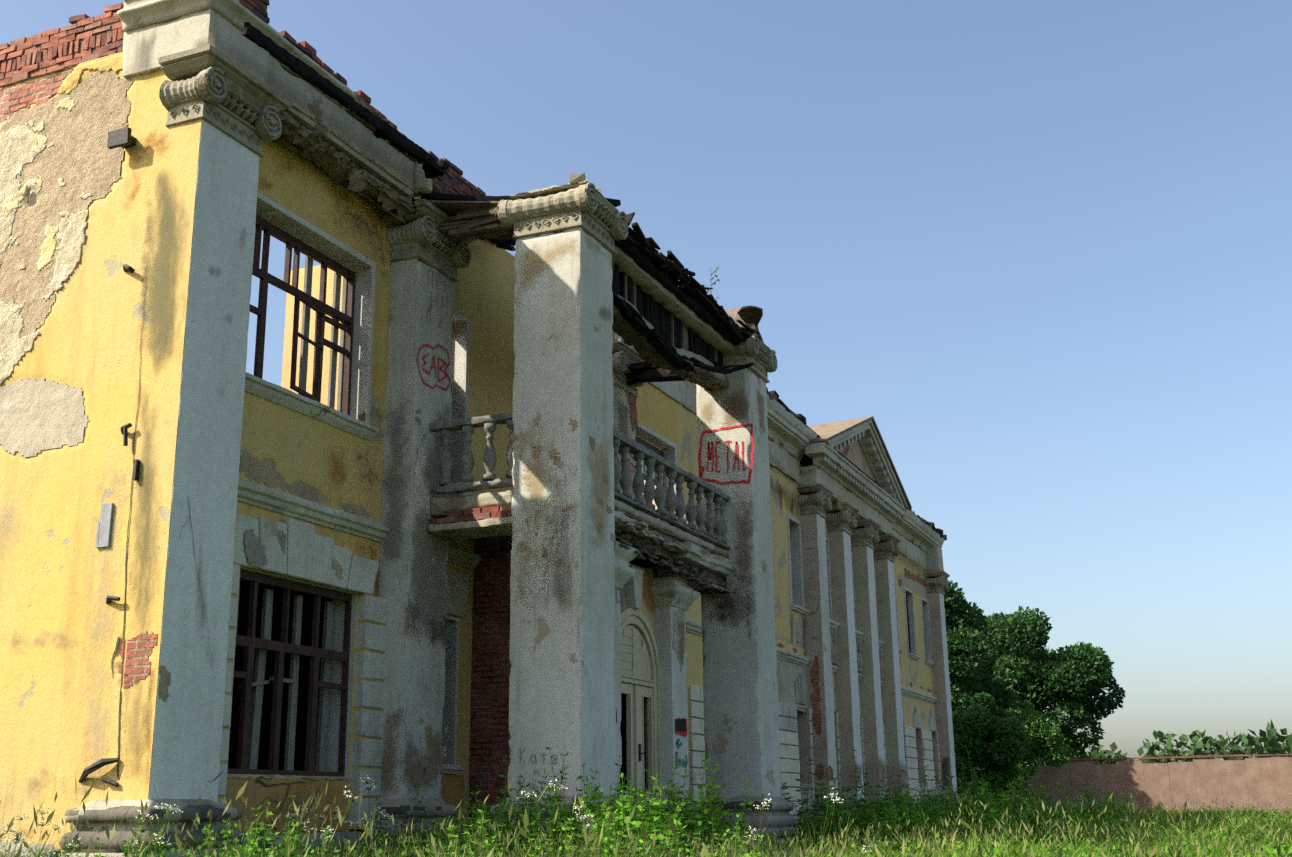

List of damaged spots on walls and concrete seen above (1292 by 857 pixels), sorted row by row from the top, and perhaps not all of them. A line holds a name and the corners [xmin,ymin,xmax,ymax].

flaking render [0,55,132,457]
damp [143,177,176,361]
damp [139,465,151,597]
spalling [615,531,731,595]
flaking render [118,631,171,702]
flaking render [774,603,822,735]